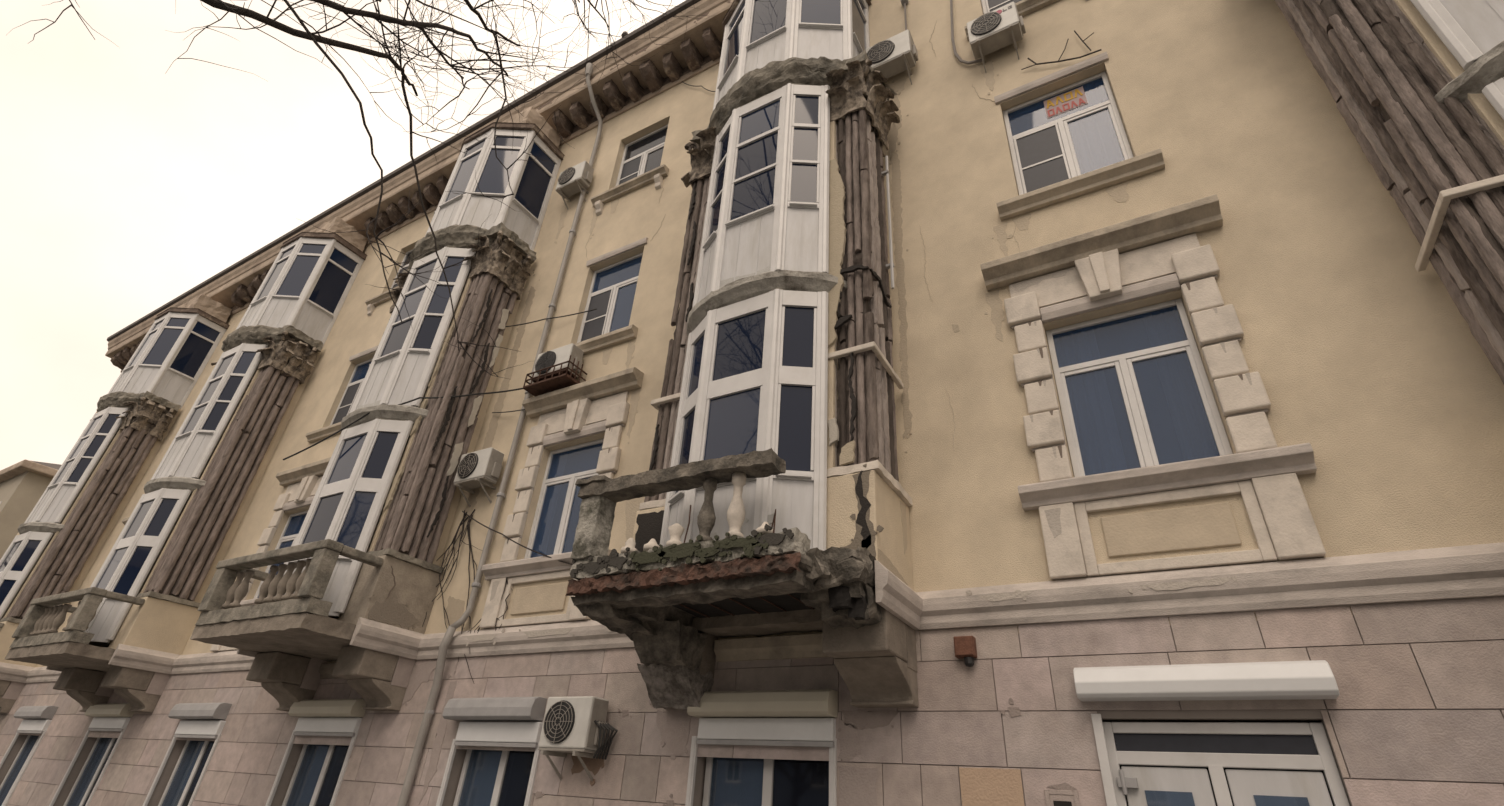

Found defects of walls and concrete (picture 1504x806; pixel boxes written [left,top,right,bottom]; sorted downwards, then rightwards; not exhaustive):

flaking render [565,418,884,641]
crack [834,265,892,548]